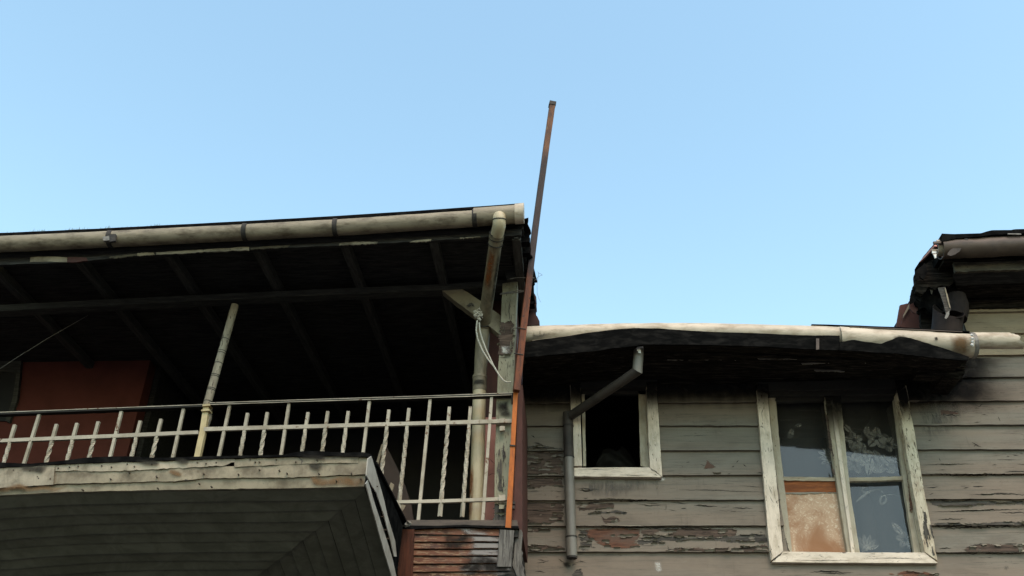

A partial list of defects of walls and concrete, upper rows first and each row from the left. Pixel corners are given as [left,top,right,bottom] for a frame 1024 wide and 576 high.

peeling [497,320,516,356]
peeling [497,445,506,492]
peeling [527,444,564,489]
peeling [527,502,768,553]
peeling [907,479,1024,555]